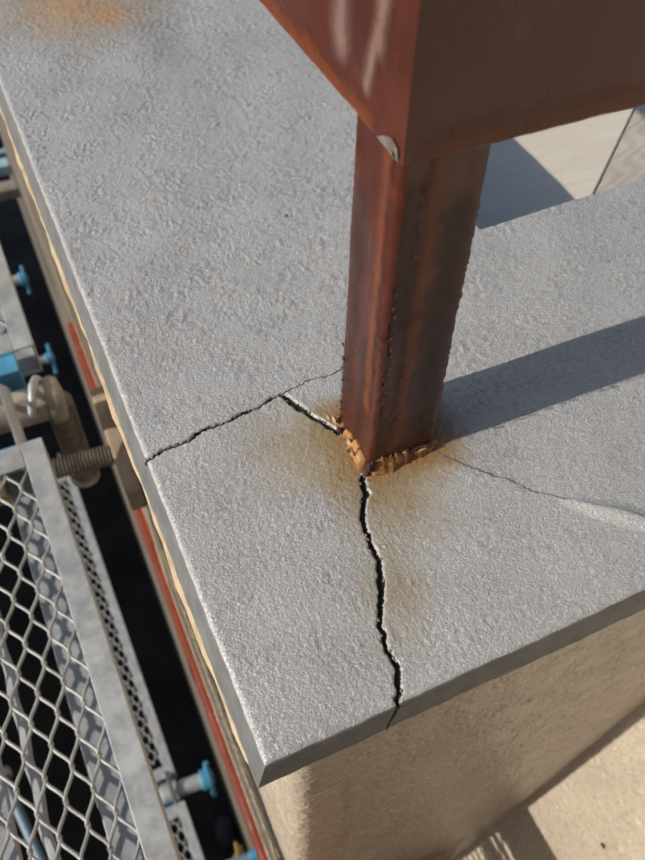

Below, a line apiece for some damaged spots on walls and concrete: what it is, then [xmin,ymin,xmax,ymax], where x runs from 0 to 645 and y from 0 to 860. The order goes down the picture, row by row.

crack [145,364,343,466]
corrosion [314,401,458,503]
crack [432,449,575,499]
crack [359,479,403,730]